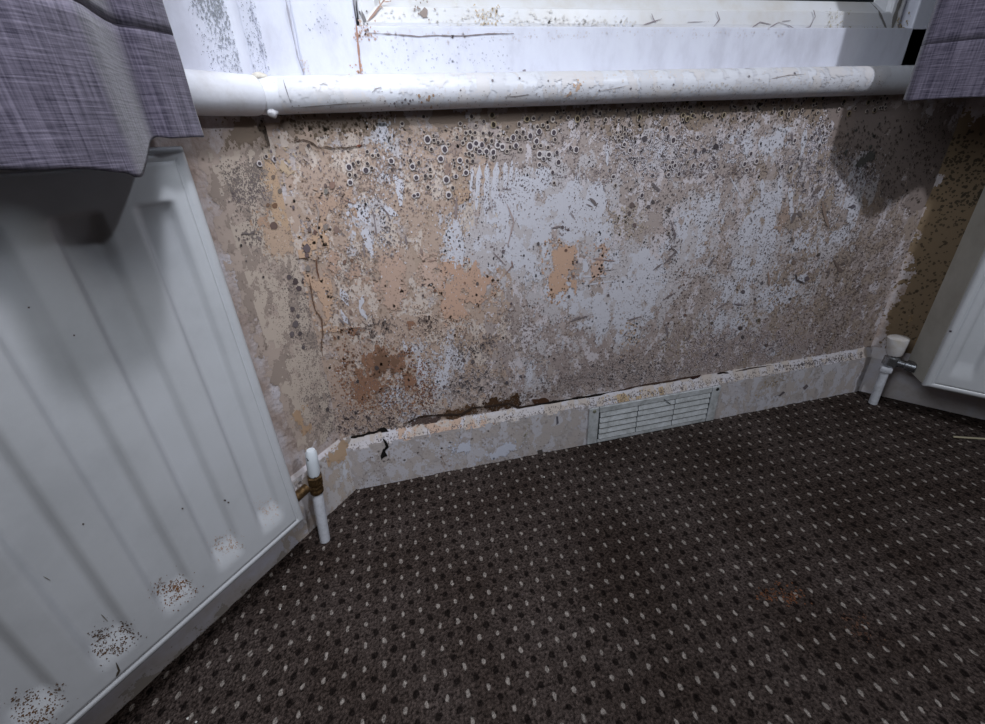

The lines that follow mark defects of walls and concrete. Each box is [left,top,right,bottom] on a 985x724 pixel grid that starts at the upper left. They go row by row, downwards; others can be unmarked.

damp [188,0,985,574]
peeling [373,118,890,427]
crack [351,376,693,460]
crack [717,365,771,374]
damp [105,579,251,724]